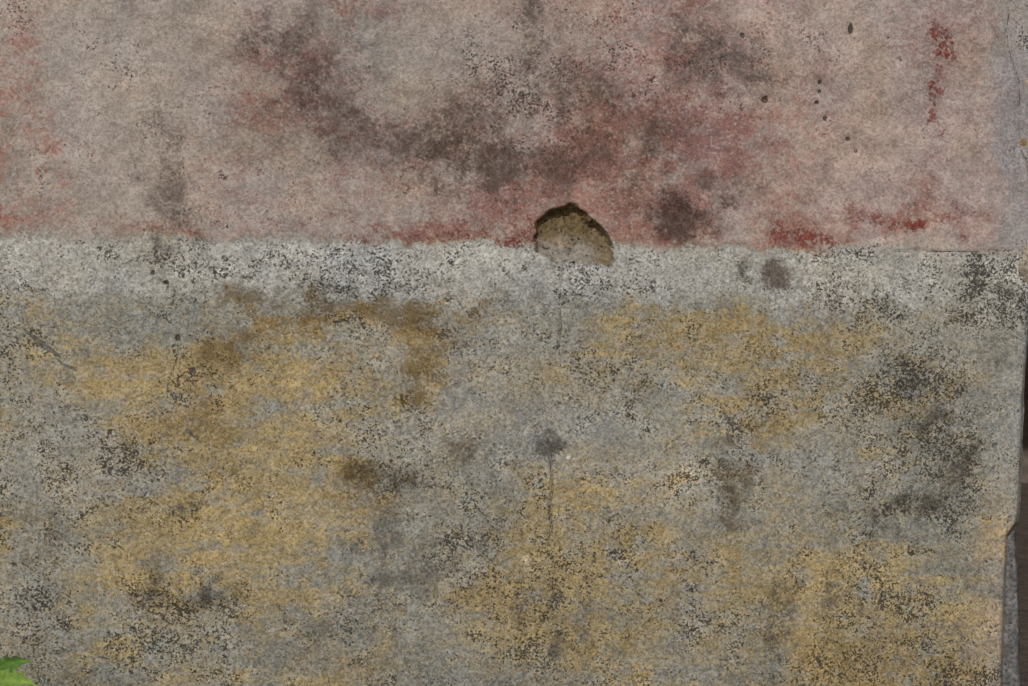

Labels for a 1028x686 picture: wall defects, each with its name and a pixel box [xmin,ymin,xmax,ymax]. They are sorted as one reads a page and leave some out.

water stain [300,96,605,192]
spalling [534,202,616,267]
water stain [649,192,711,243]